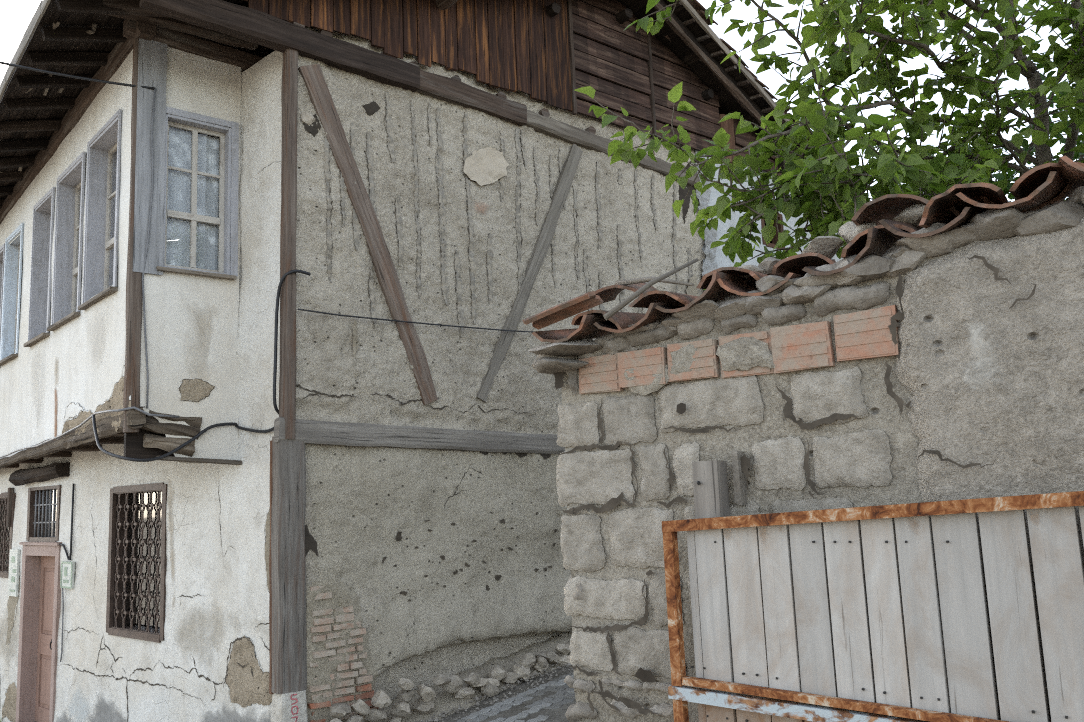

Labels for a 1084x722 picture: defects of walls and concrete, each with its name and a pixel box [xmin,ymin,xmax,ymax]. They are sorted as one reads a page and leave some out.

flaking render [62,376,175,459]
flaking render [178,378,215,402]
crack [59,509,269,722]
flaking render [225,635,272,707]
flaking render [308,586,379,722]
leakage [91,700,126,722]
leakage [204,707,271,722]